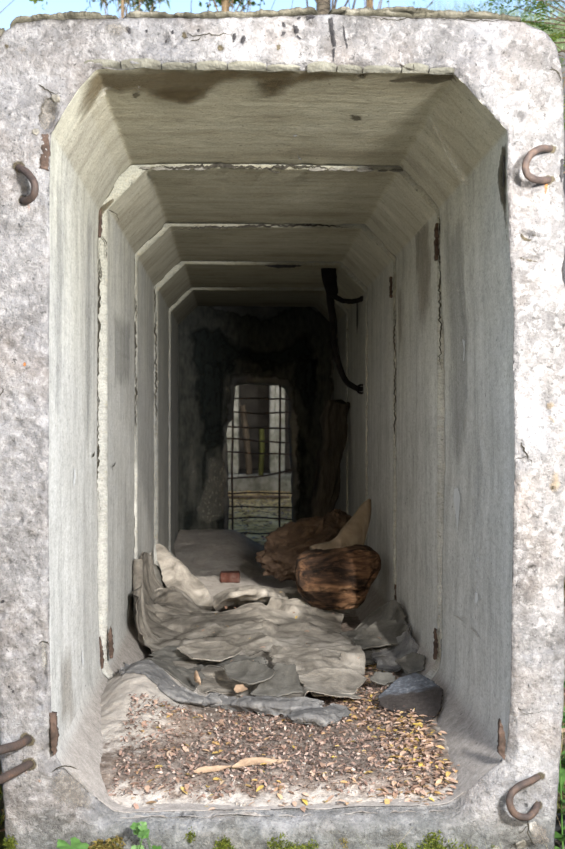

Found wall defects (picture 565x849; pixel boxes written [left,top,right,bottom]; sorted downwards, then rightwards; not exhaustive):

damp [85,71,337,106]
crack [170,223,349,231]
crack [93,236,116,510]